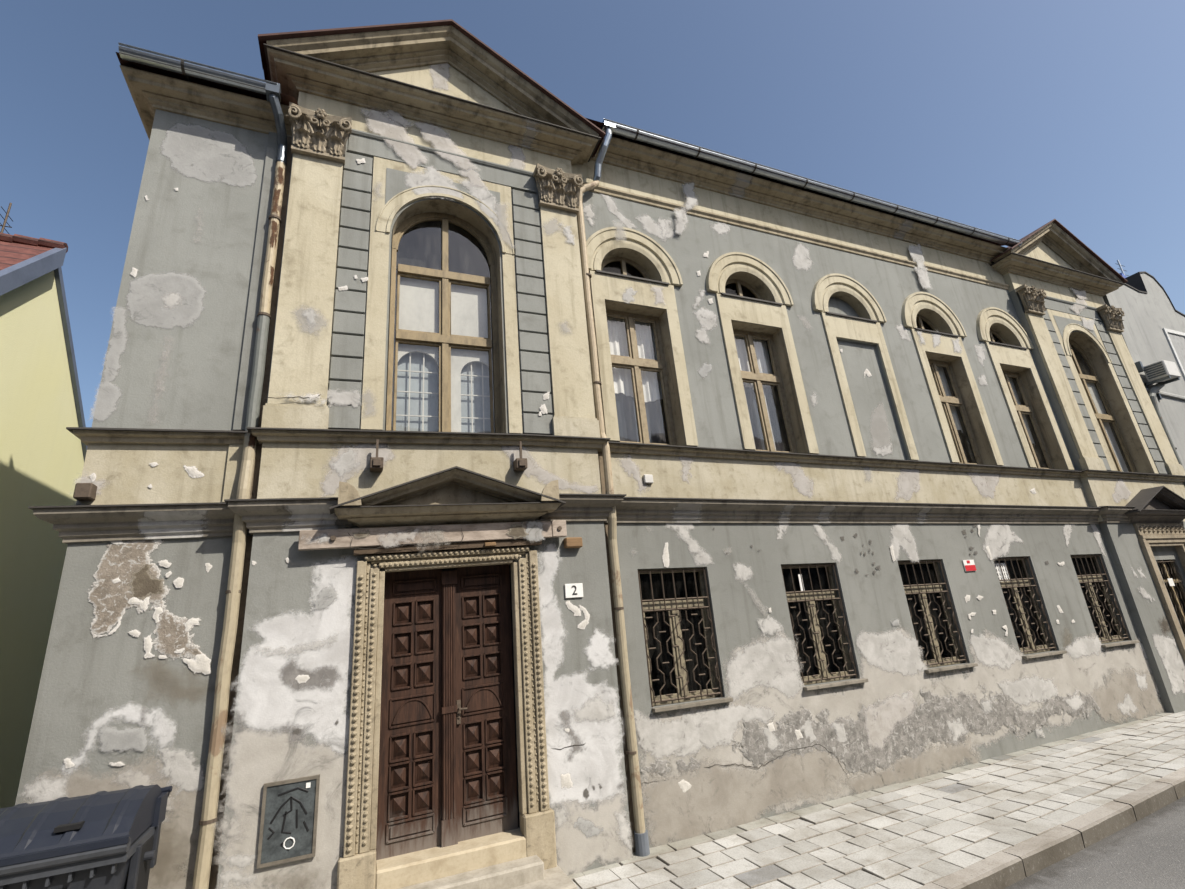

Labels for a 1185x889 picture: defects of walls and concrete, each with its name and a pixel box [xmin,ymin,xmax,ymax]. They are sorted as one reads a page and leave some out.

peeling [461,179,500,226]
peeling [90,307,128,421]
peeling [662,523,712,568]
peeling [88,539,211,675]
peeling [566,600,590,629]
flaking render [634,595,1166,847]
flaking render [555,794,632,876]